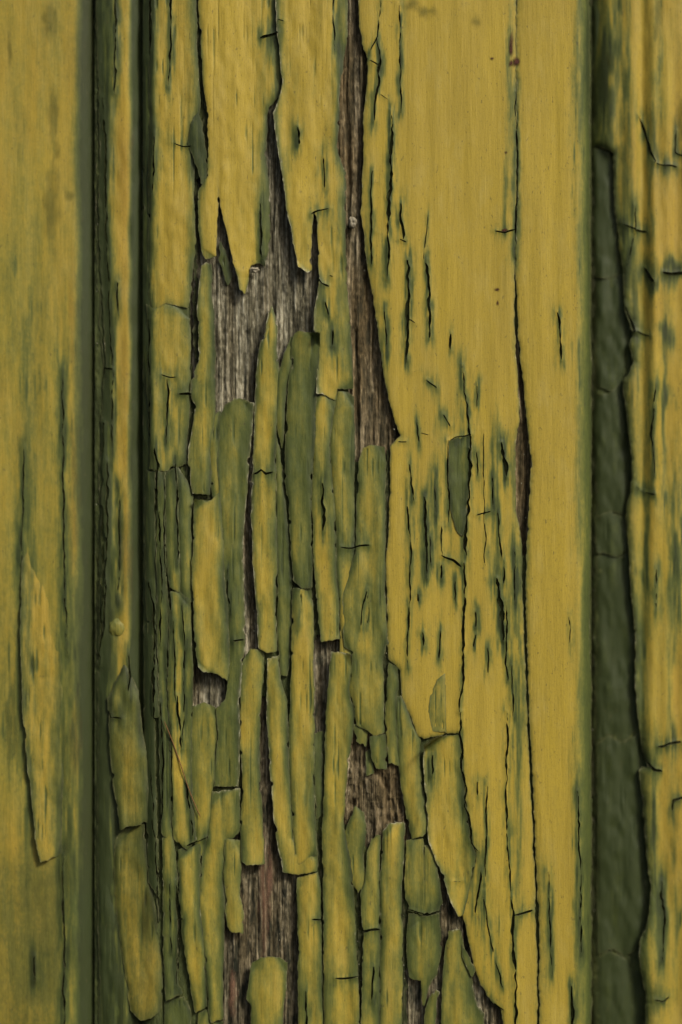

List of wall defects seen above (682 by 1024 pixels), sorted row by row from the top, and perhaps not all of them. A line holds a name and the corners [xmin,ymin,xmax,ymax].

crack [366,5,452,360]
crack [496,99,518,250]
peeling [20,552,64,862]
peeling [97,0,503,1024]
crack [292,373,552,1024]
crack [569,0,682,1024]